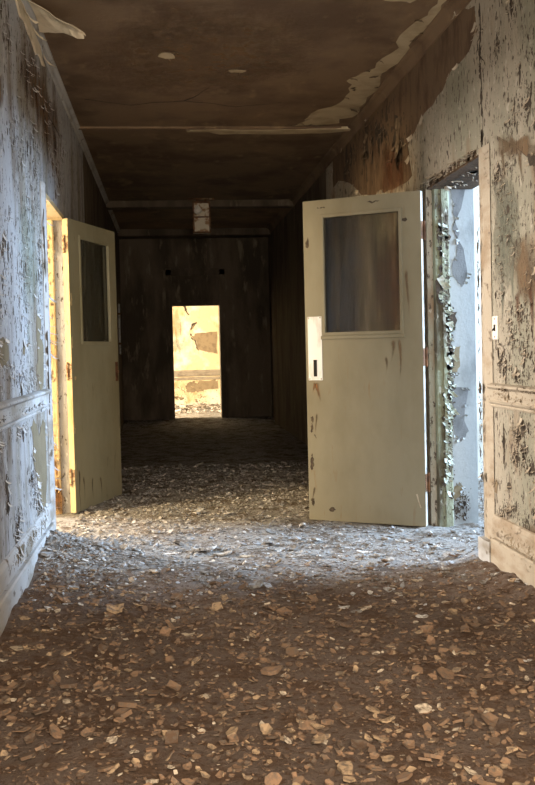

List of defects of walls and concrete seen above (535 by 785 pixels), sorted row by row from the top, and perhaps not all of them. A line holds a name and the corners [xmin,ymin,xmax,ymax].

water stain [21,48,57,157]
peeling [187,0,446,203]
peeling [496,27,535,139]
peeling [0,0,67,399]
spalling [174,379,218,403]
spalling [189,324,219,354]
peeling [416,145,535,571]
peeling [0,395,66,571]